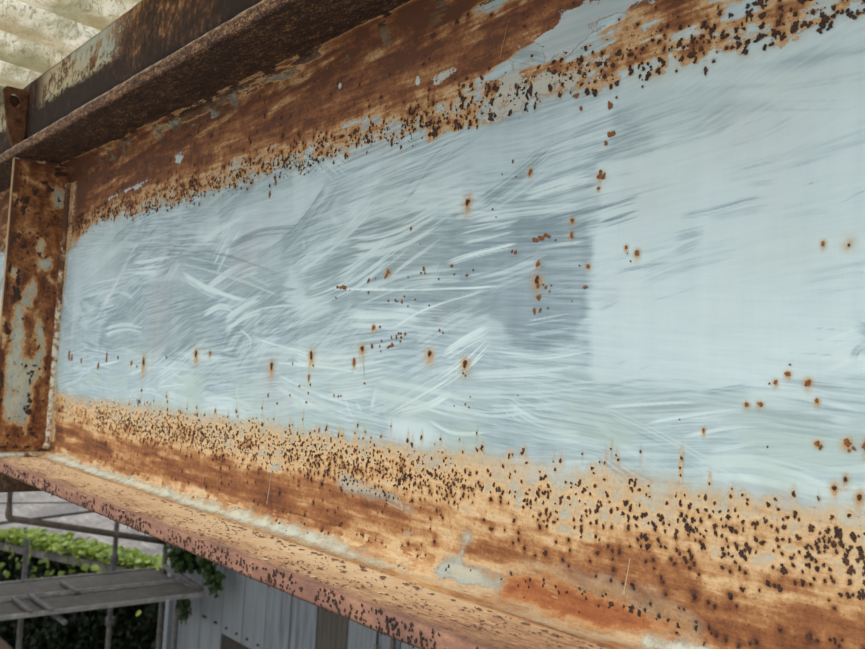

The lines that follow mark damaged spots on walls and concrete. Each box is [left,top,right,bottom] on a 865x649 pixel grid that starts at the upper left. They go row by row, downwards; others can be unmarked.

corrosion [61,0,585,283]
peeling [481,0,655,125]
corrosion [500,0,865,116]
corrosion [0,158,865,649]